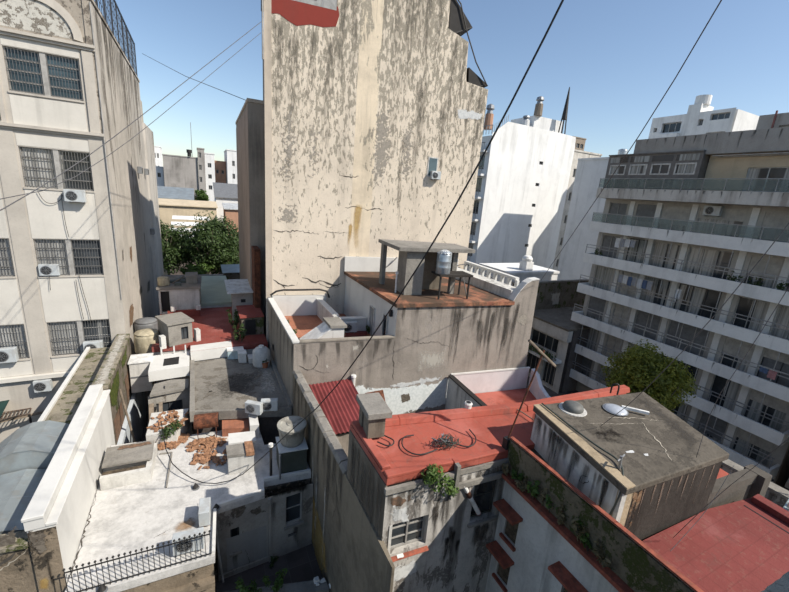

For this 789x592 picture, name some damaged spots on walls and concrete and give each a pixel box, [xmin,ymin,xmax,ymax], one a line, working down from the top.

damp [349,207,361,236]
crack [274,278,341,288]
damp [475,304,519,349]
damp [273,449,342,571]
damp [351,447,503,542]
damp [443,527,460,560]